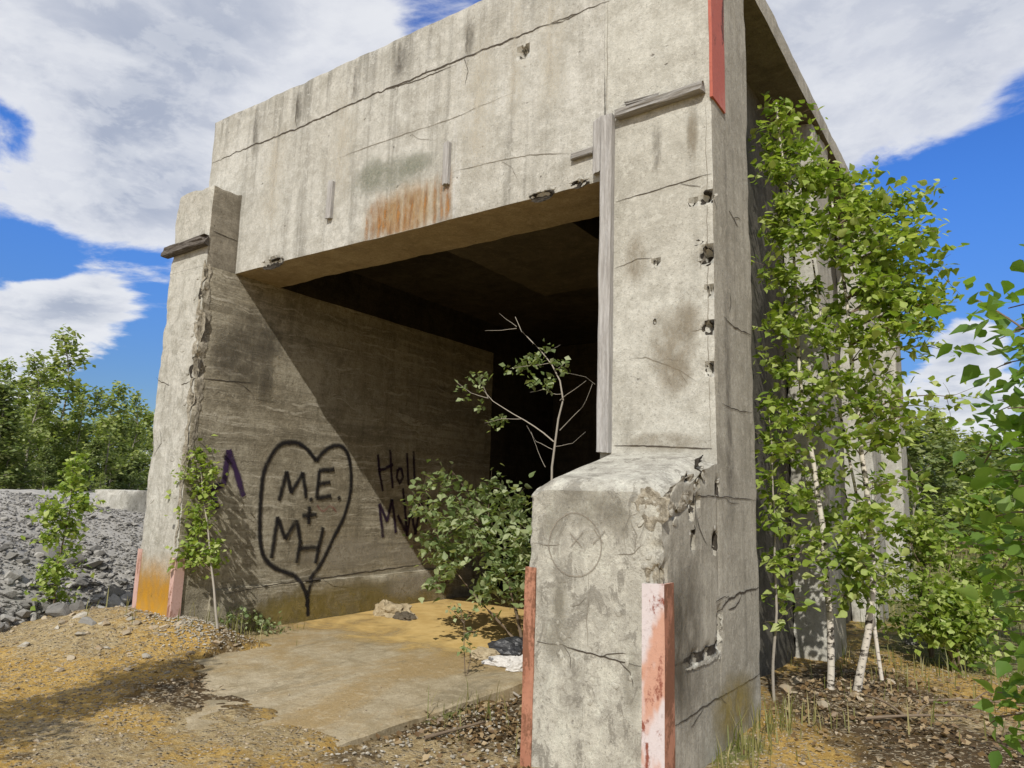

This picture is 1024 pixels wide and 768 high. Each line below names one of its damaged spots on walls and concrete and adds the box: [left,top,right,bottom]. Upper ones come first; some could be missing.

crack [213,1,608,163]
crack [451,153,565,178]
rust [366,190,450,235]
crack [615,105,752,449]
hole [695,239,714,266]
spalling [183,264,213,406]
spalling [630,455,720,548]
crack [688,494,759,612]
crack [537,573,637,683]
spalling [683,614,724,670]
crack [675,675,758,726]